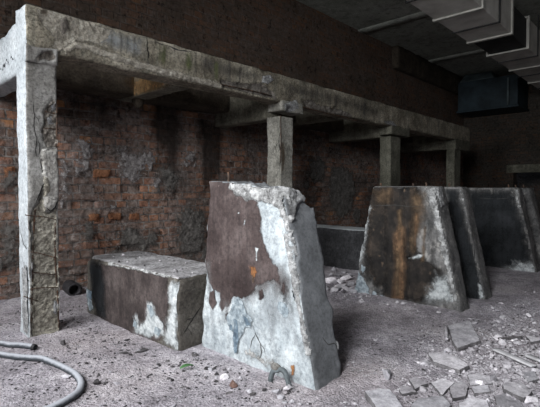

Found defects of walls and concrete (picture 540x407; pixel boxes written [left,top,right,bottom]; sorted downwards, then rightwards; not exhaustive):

crack [32,93,40,157]
spalling [0,99,111,337]
peeling [86,261,179,349]
peeling [174,181,312,356]
damp [368,193,387,286]
rust [393,211,405,299]
damp [402,187,453,301]